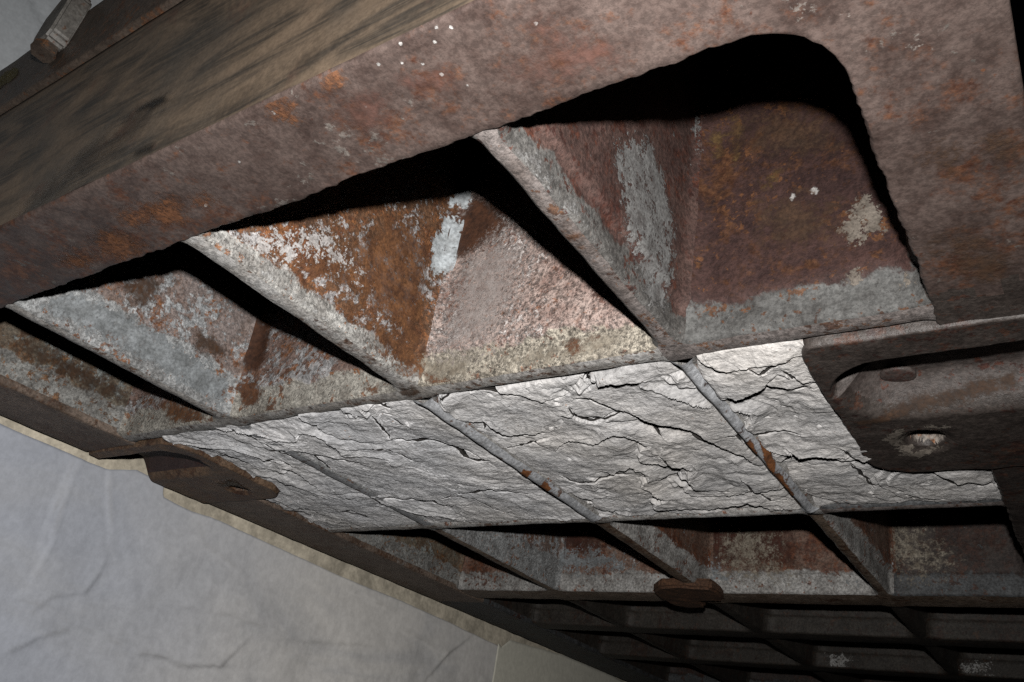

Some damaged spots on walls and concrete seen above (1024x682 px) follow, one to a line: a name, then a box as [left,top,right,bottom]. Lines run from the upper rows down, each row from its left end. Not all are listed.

corrosion [292,212,450,396]
corrosion [16,336,128,404]
corrosion [235,318,274,411]
crack [439,386,514,401]
corrosion [565,339,581,356]
crack [569,372,620,421]
crack [748,365,804,389]
crack [210,403,537,523]
crack [565,422,679,499]
corrosion [744,439,801,506]
crack [831,449,877,486]
corrosion [713,520,793,571]